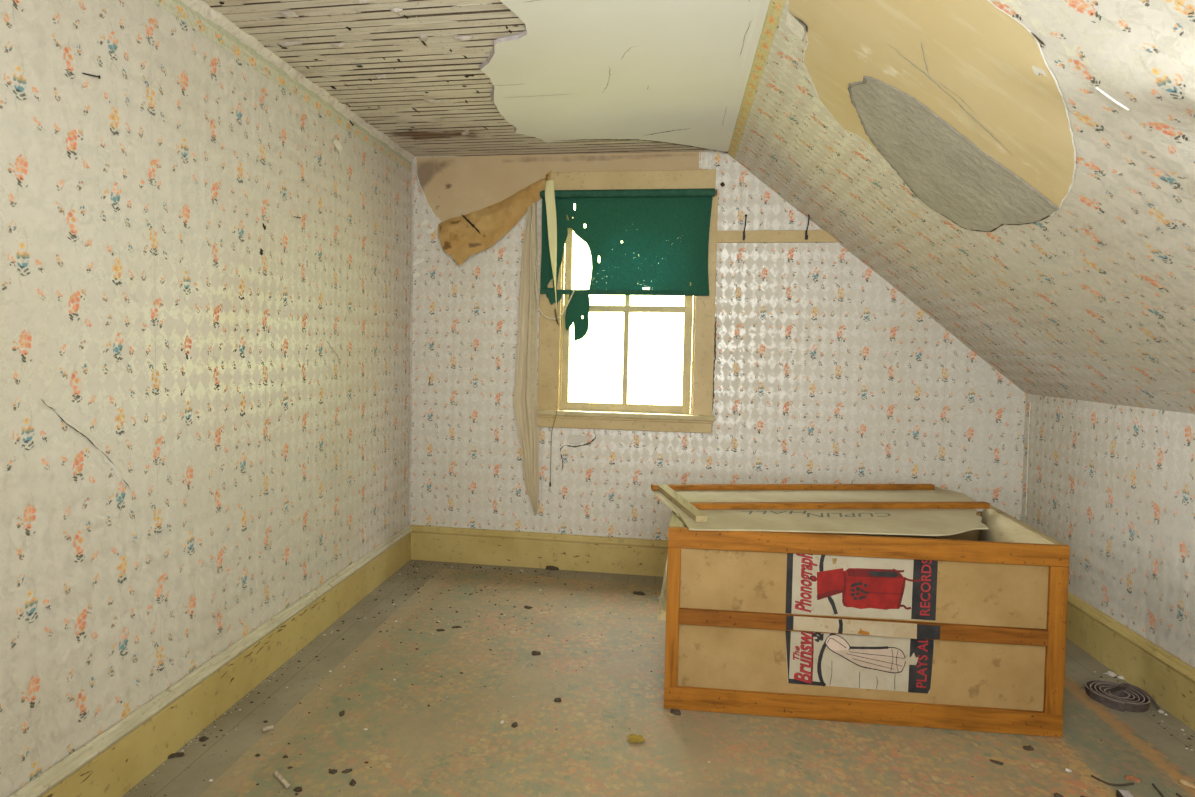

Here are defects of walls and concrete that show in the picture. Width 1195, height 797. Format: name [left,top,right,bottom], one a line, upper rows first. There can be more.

flaking render [180,0,725,326]
flaking render [785,0,1077,232]
crack [41,399,131,489]